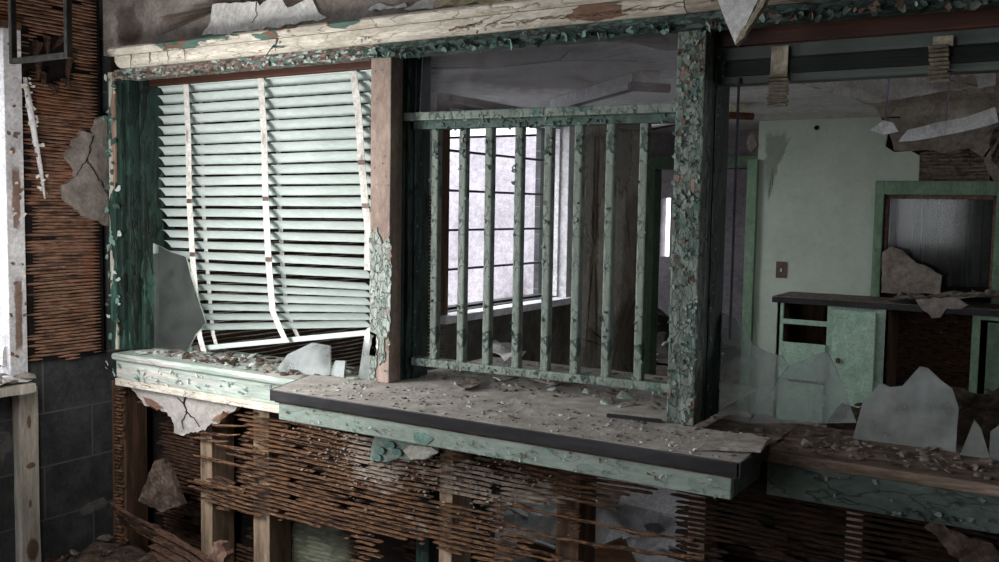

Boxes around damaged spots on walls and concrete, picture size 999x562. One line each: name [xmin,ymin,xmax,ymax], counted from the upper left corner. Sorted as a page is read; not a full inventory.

crack [76,136,108,195]
peeling [102,0,727,411]
crack [177,397,200,429]
peeling [336,412,440,462]